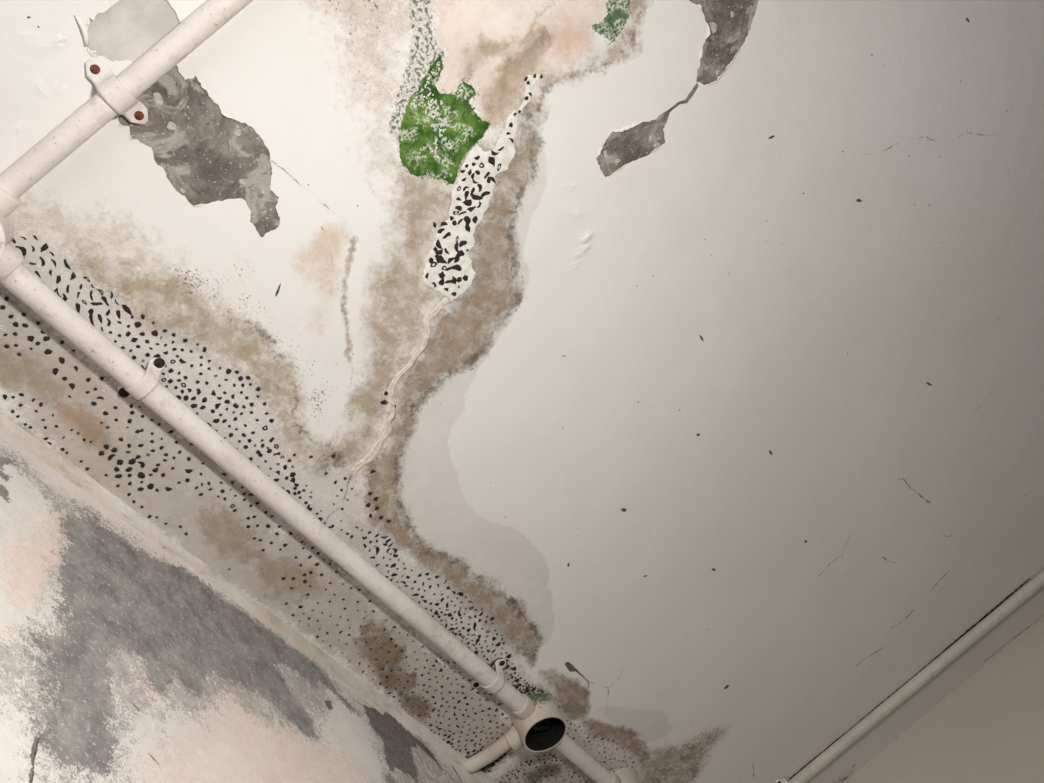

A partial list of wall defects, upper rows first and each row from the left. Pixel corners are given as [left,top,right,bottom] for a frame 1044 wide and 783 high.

spalling [74,0,180,62]
spalling [116,64,280,237]
damp [377,0,442,142]
spalling [596,0,758,177]
damp [0,31,717,783]
peeling [0,455,16,503]
crack [29,736,40,783]